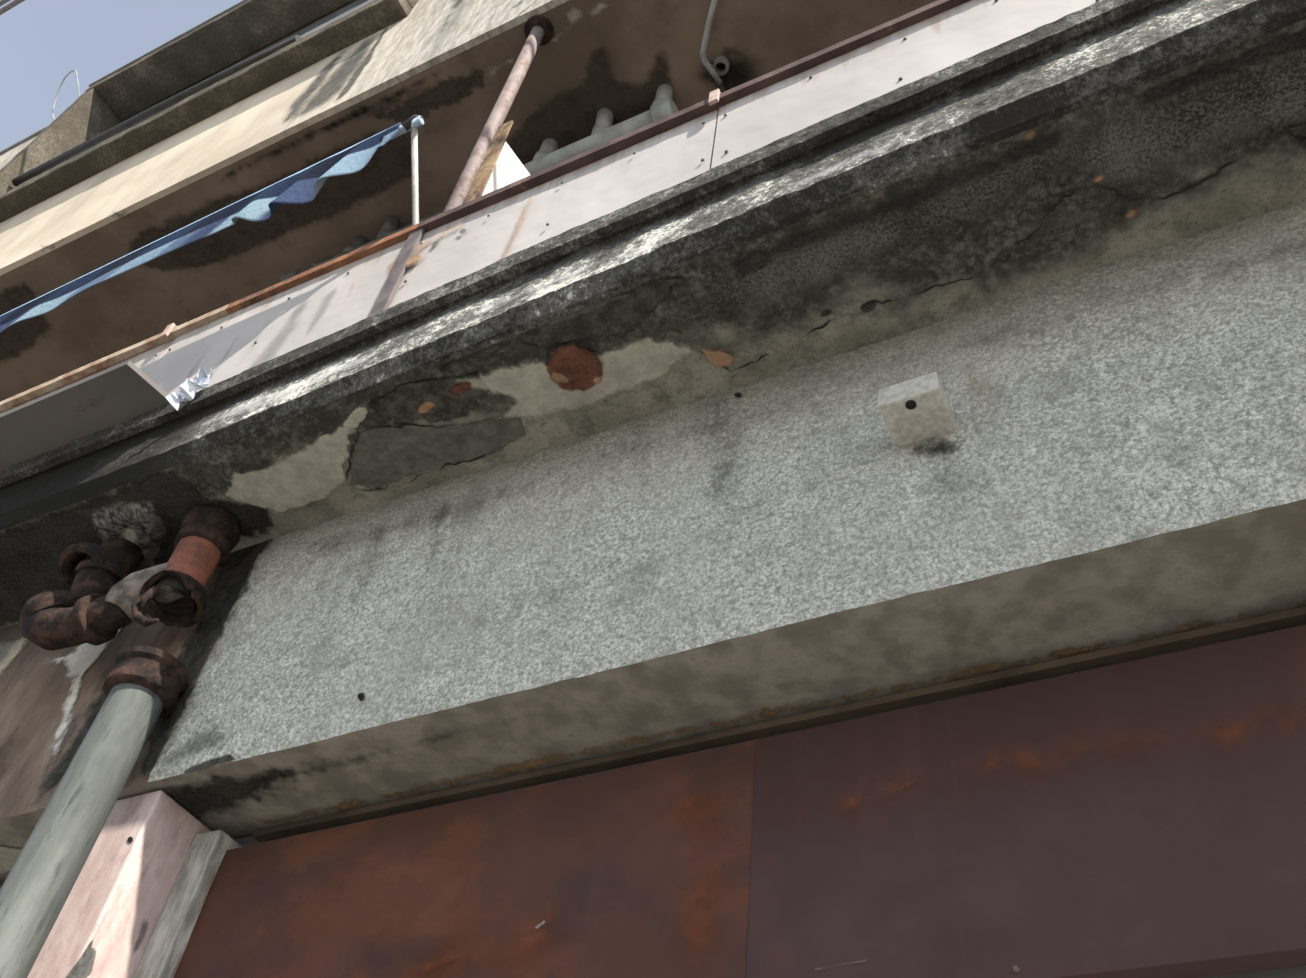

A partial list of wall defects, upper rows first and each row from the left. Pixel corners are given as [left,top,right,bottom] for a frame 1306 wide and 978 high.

leakage [285,28,387,121]
leakage [272,107,369,154]
rust [545,340,602,391]
peeling [225,338,734,513]
peeling [0,638,26,675]
peeling [51,628,122,763]